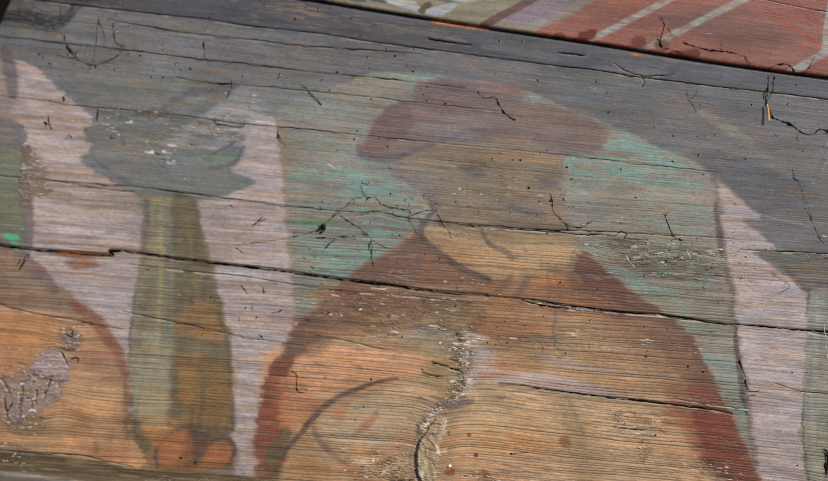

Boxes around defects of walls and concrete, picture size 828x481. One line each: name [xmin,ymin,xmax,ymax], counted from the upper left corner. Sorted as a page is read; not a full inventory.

crack [0,175,680,240]
crack [0,244,828,333]
peeling [0,328,84,435]
crack [820,452,828,474]